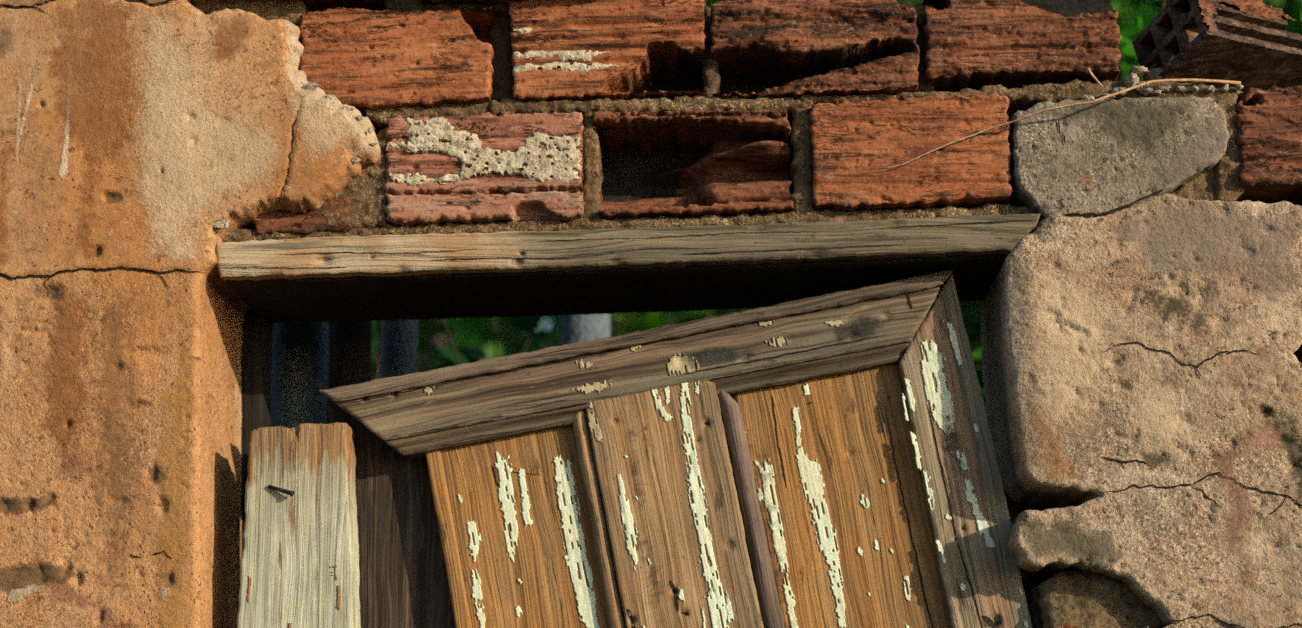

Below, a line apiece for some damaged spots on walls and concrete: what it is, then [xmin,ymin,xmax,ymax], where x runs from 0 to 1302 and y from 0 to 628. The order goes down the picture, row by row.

crack [0,0,53,13]
crack [128,0,174,8]
peeling [280,18,380,173]
peeling [213,217,246,236]
crack [0,266,204,294]
crack [1100,334,1262,378]
crack [1094,456,1302,514]
spalling [0,563,76,602]
crack [1159,614,1244,628]